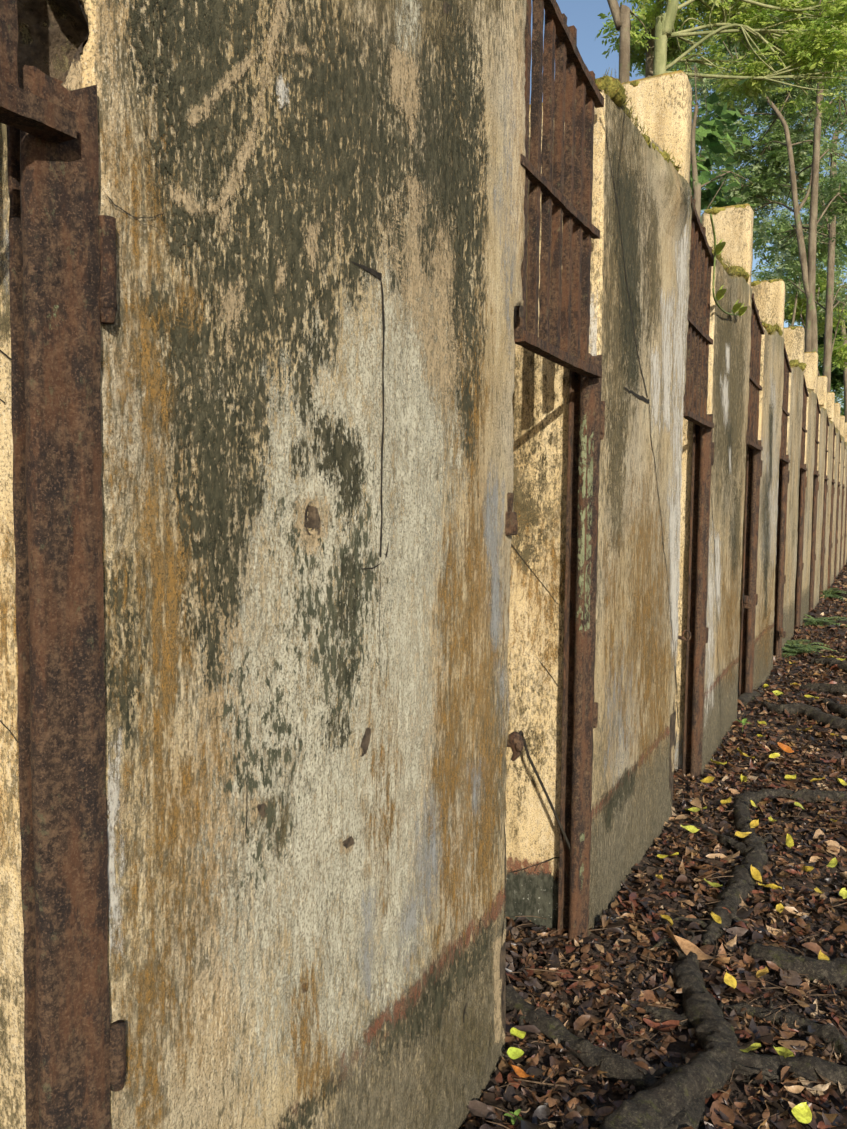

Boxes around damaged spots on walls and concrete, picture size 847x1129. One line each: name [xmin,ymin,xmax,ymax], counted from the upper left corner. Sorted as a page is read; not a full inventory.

damp [0,123,11,346]
damp [0,579,18,697]
damp [100,0,566,1129]
damp [601,152,690,833]
mould [0,977,24,1129]